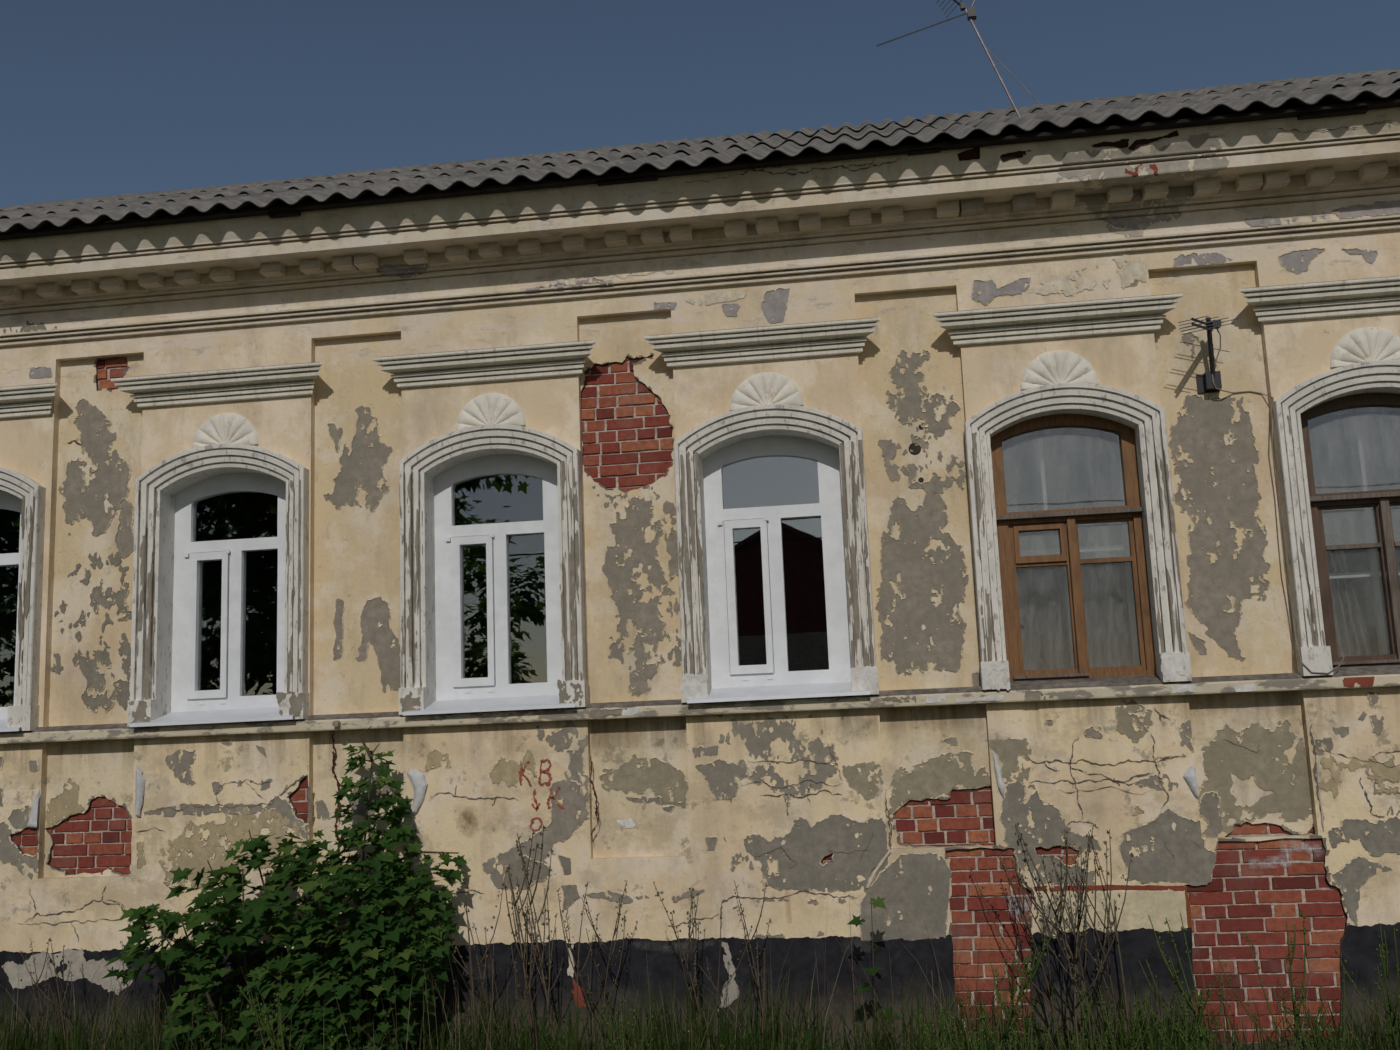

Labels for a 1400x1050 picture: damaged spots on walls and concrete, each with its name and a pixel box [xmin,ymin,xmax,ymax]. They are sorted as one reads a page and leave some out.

peeling [29,366,52,378]
peeling [17,496,35,705]
peeling [51,357,157,727]
peeling [0,749,331,890]
peeling [276,479,305,717]
peeling [349,776,392,817]
peeling [323,406,423,712]
peeling [482,349,1400,1045]
crack [1028,707,1201,859]
crack [1310,724,1400,818]